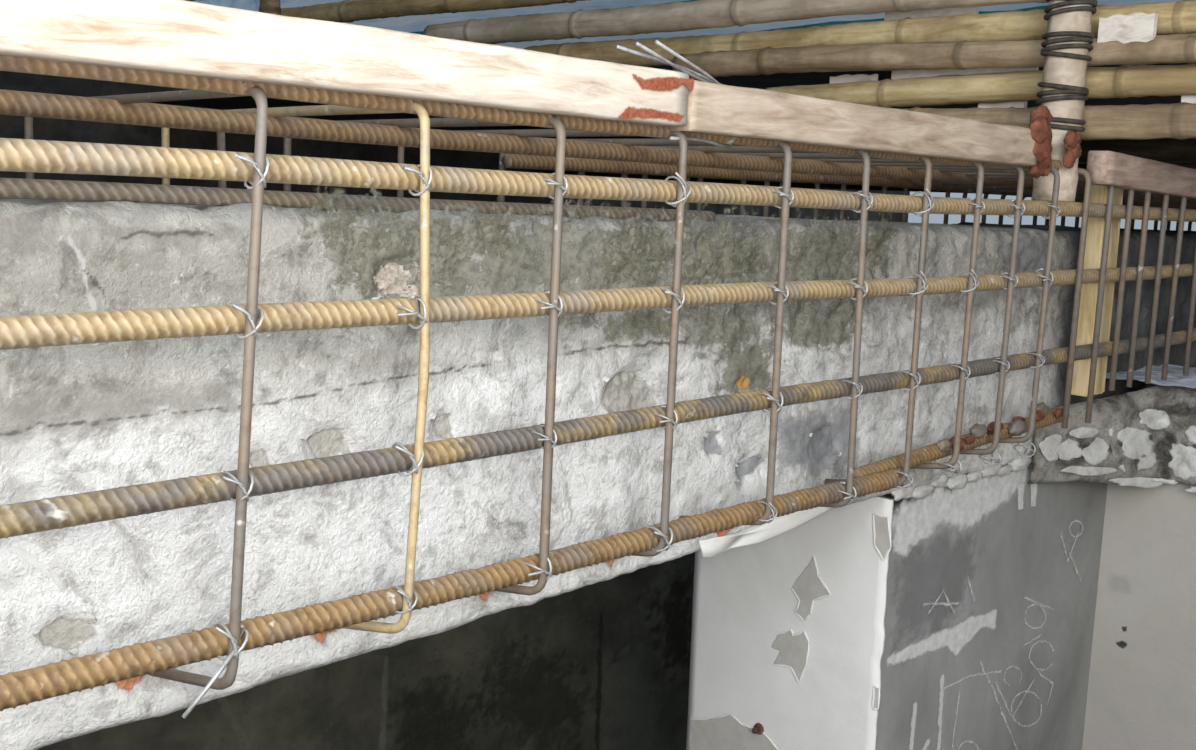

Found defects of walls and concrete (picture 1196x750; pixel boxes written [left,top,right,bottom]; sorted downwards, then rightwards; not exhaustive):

crack [183,364,491,413]
crack [0,415,148,435]
spalling [891,403,1196,501]
peeling [873,513,891,560]
peeling [772,556,831,683]
peeling [689,714,779,750]